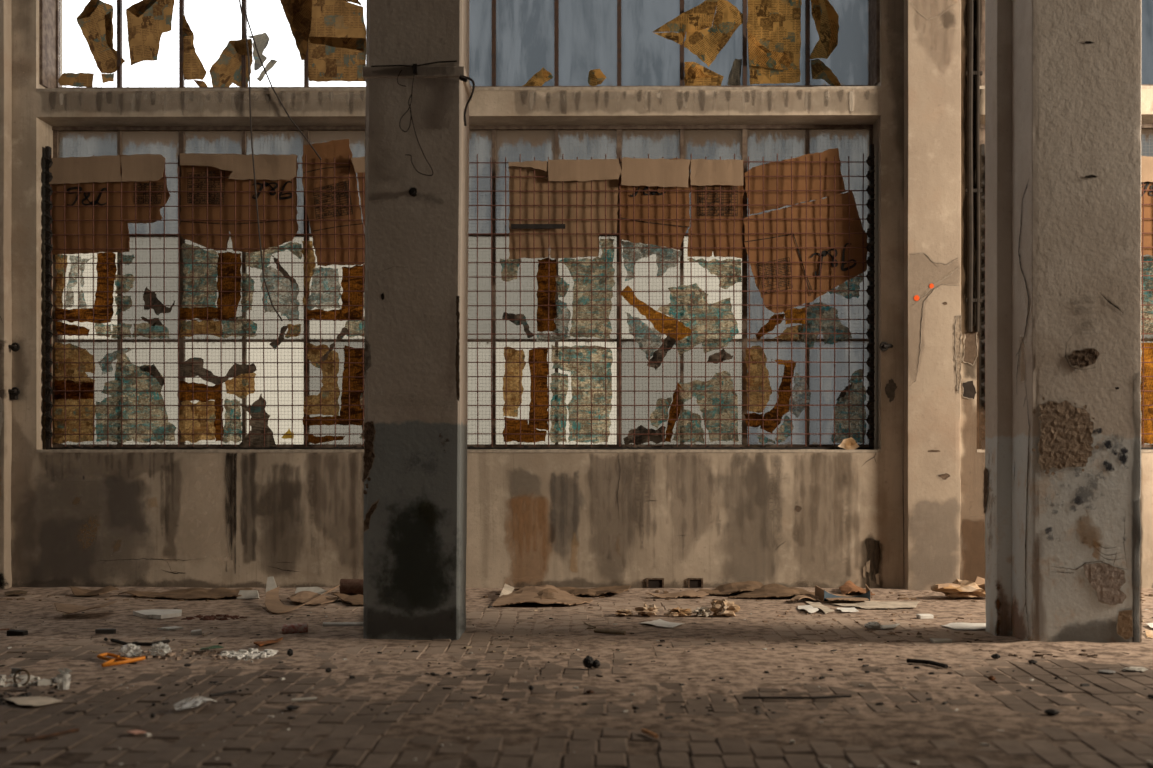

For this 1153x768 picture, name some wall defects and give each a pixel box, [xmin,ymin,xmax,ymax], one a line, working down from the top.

spalling [1067,348,1100,369]
peeling [1032,397,1099,476]
water stain [225,453,237,571]
water stain [379,502,452,614]
peeling [1083,563,1133,640]